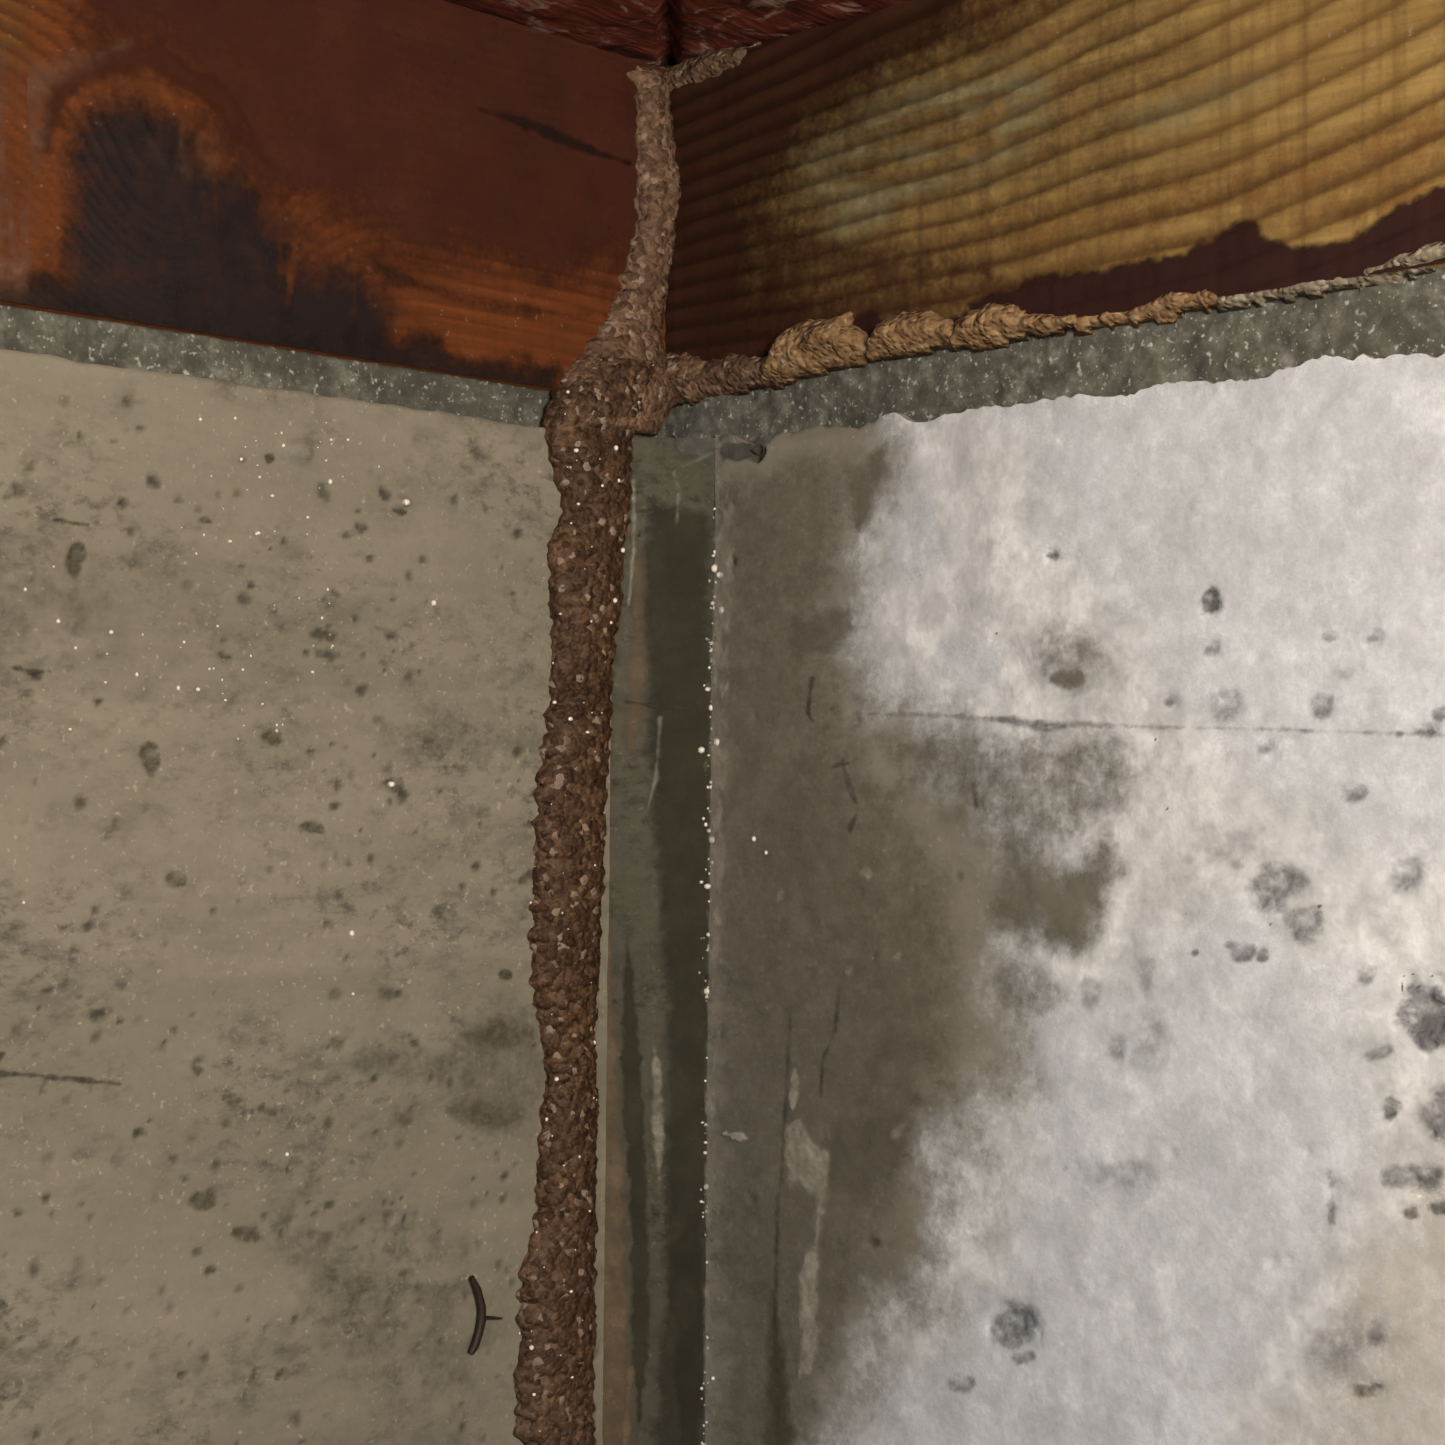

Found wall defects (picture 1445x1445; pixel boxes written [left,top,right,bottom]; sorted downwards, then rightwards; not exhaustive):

leakage [0,0,668,389]
leakage [665,0,1445,361]
leakage [621,353,1445,1445]